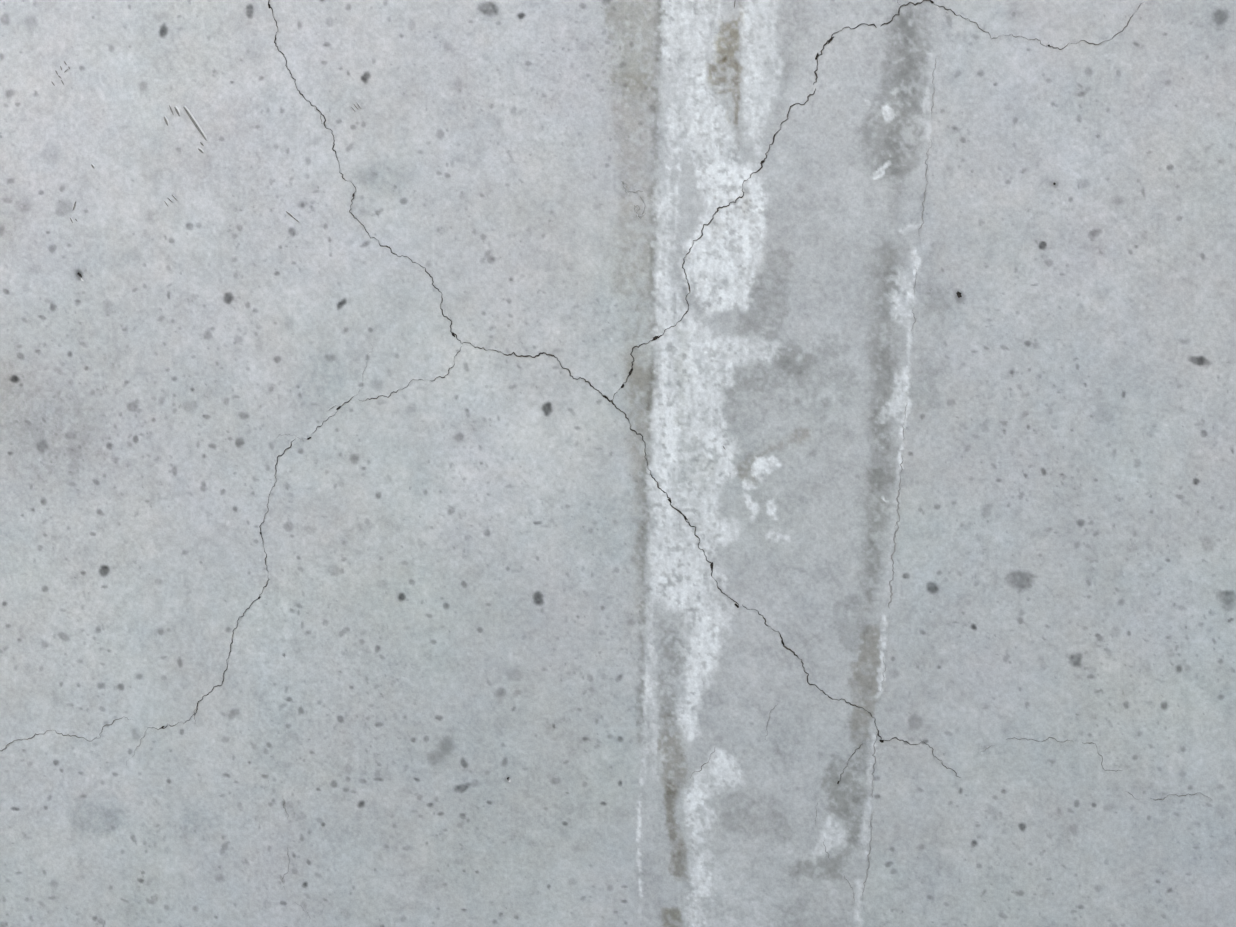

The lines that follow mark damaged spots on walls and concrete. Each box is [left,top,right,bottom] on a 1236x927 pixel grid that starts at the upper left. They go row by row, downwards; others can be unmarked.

crack [0,0,1144,784]
damp [596,0,964,927]